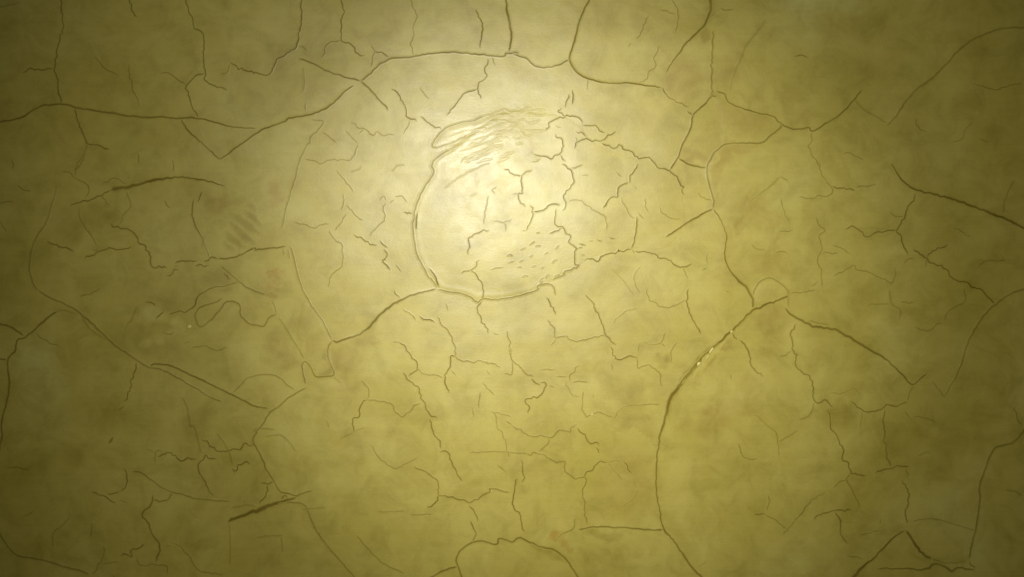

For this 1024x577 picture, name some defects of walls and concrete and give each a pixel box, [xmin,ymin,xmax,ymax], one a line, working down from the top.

crack [0,0,1024,334]
crack [0,308,77,471]
crack [92,468,173,577]
crack [145,396,253,497]
crack [227,495,297,523]
crack [332,186,975,577]